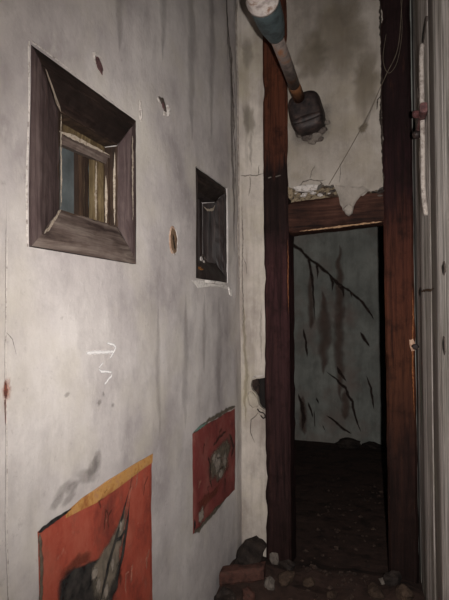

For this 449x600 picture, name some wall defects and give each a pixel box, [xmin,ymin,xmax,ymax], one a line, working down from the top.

spalling [157,96,171,116]
flaking render [25,39,143,247]
spalling [288,184,384,216]
spalling [169,226,178,255]
crack [294,244,373,318]
spalling [248,375,266,440]
crack [298,367,361,434]